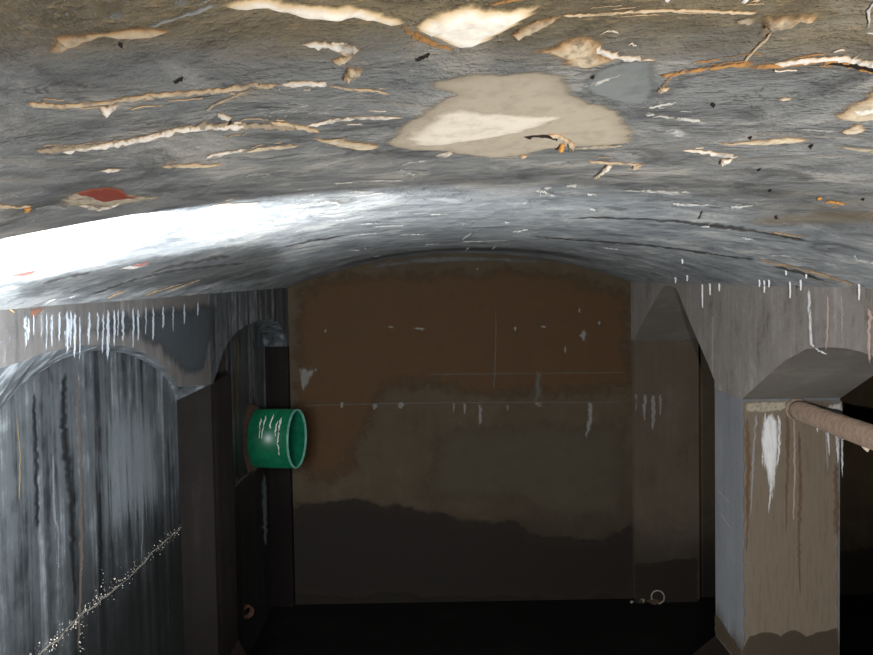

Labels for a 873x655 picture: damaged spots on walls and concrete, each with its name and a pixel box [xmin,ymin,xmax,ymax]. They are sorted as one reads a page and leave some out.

spalling [403,0,559,51]
spalling [542,30,654,68]
crack [658,3,873,94]
peeling [386,71,635,158]
spalling [836,93,873,122]
water stain [95,255,241,299]
water stain [23,299,214,372]
water stain [30,377,182,655]
water stain [293,499,698,603]
water stain [715,401,873,655]